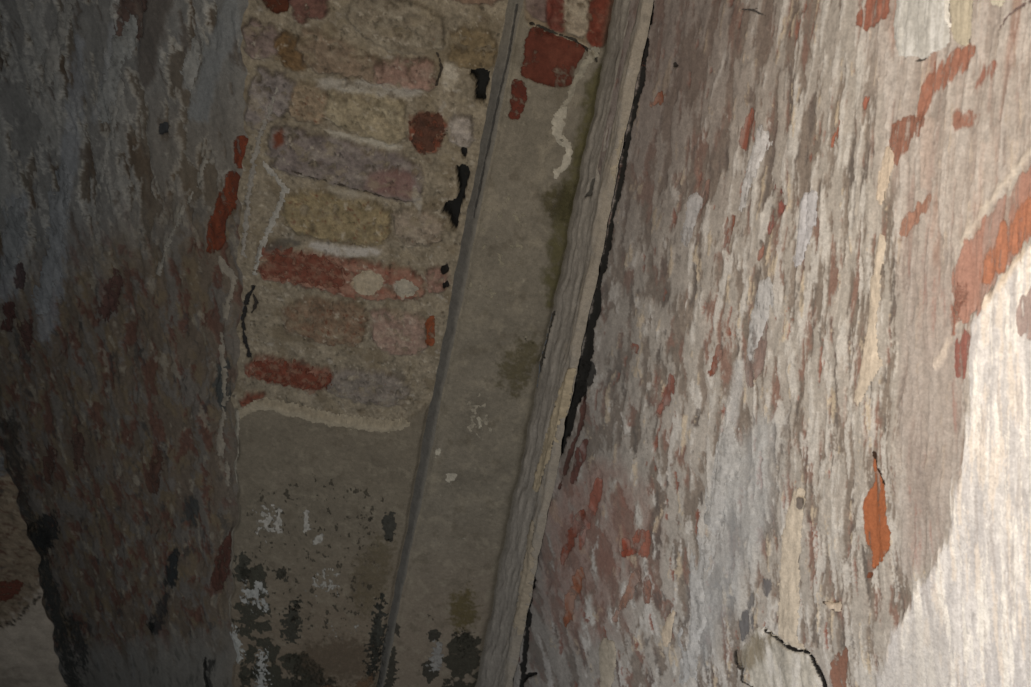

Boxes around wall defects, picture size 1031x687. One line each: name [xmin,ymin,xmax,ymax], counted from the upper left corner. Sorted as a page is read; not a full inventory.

flaking render [263,0,289,14]
leakage [551,46,600,179]
leakage [213,360,231,409]
crack [241,285,258,357]
spalling [206,86,419,487]
crack [558,1,654,490]
flaking render [951,166,1031,379]
flaking render [863,451,891,578]
leakage [230,479,401,687]
leakage [419,614,482,687]
crack [520,577,537,687]
crack [764,629,827,687]